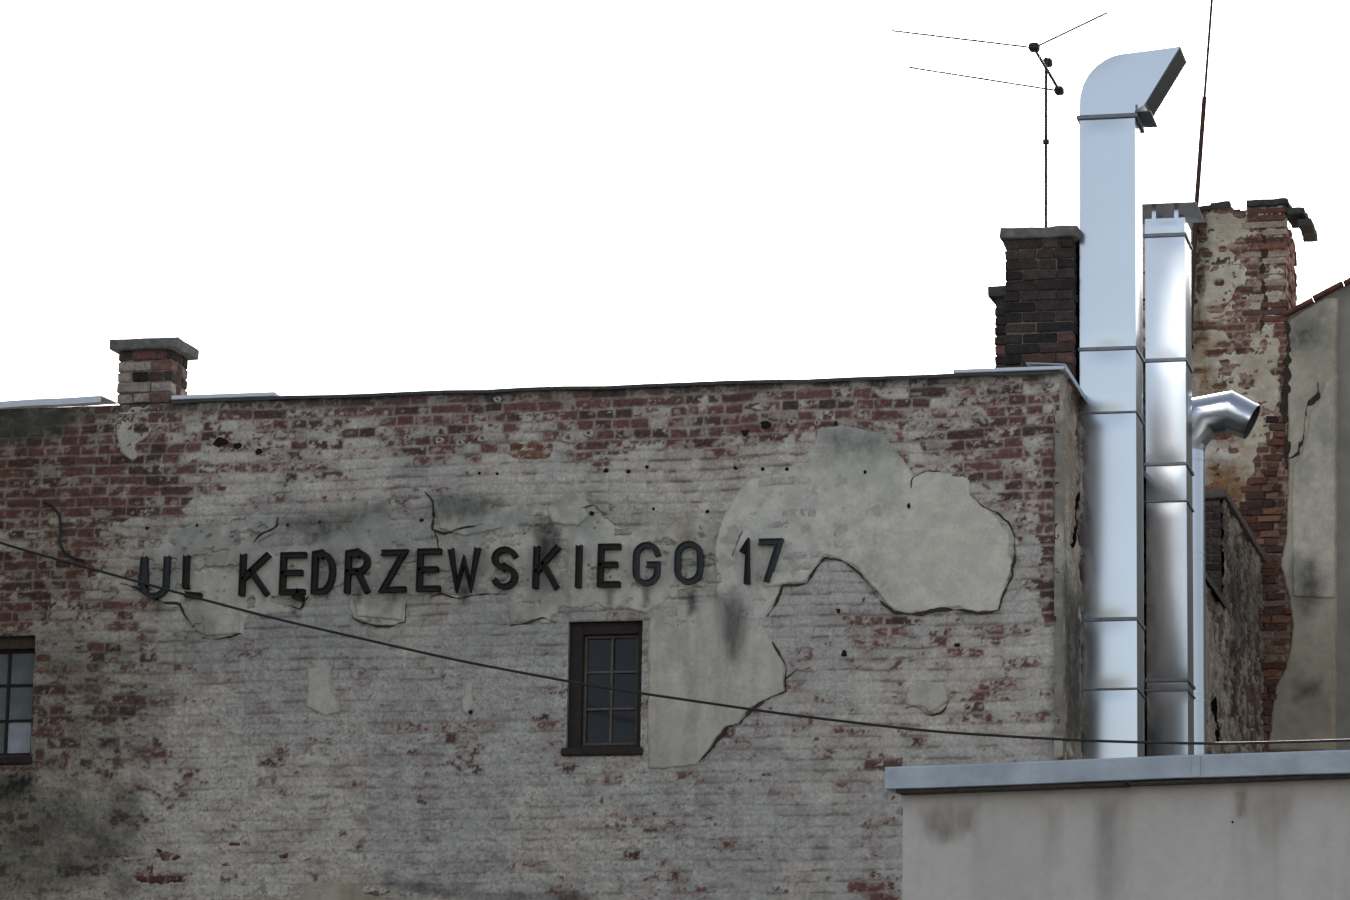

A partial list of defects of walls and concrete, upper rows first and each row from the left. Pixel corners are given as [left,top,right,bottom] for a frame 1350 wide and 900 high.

peeling [142,425,1013,770]